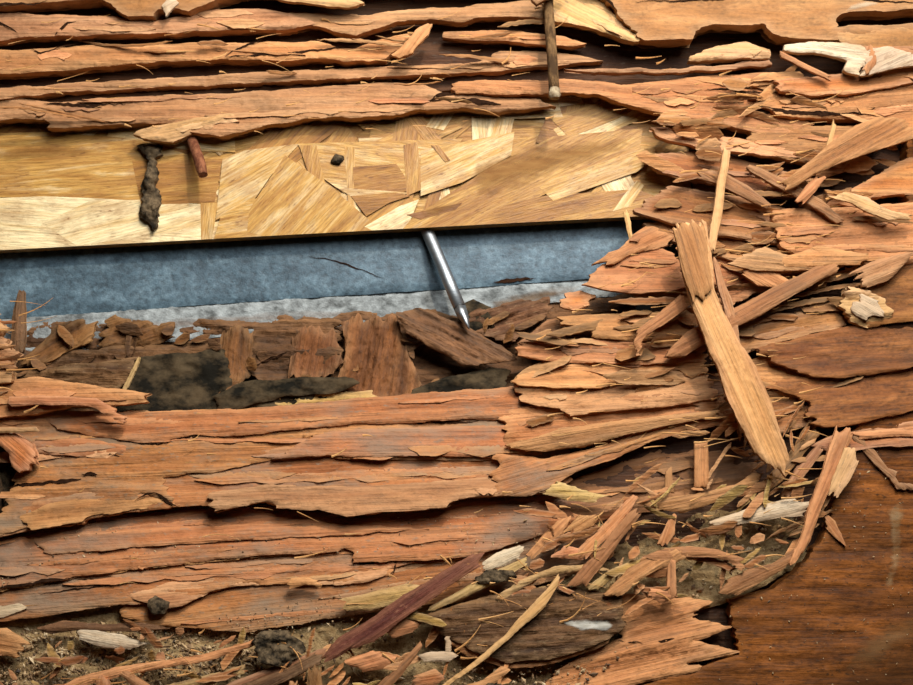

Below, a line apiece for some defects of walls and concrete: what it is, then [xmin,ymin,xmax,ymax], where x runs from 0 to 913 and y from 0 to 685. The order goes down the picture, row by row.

peeling [0,0,640,145]
crack [640,0,713,8]
crack [867,0,913,8]
peeling [556,27,913,452]
peeling [0,127,757,633]
crack [879,321,913,329]